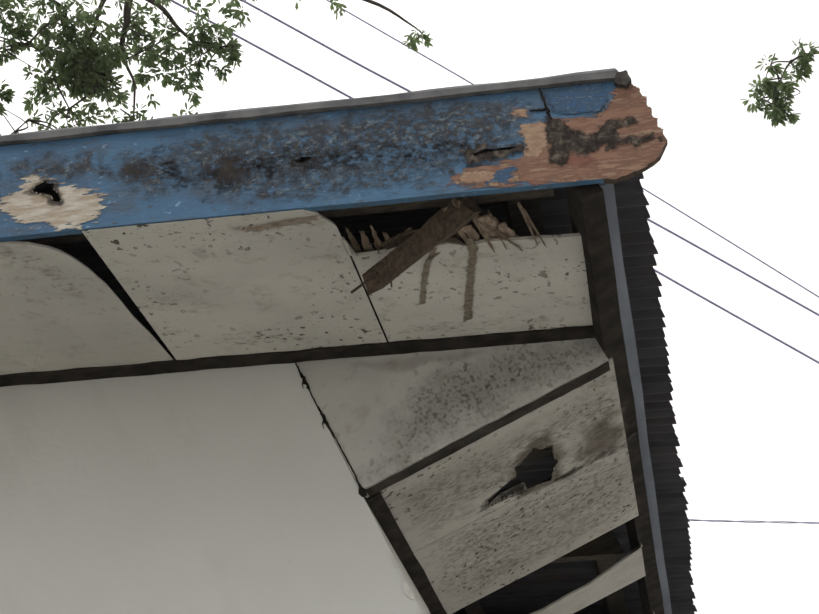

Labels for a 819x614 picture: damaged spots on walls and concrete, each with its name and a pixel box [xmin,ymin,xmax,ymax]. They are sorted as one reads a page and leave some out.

peeling [0,151,111,231]
peeling [113,83,667,204]
crack [295,363,368,497]
damp [480,398,624,511]